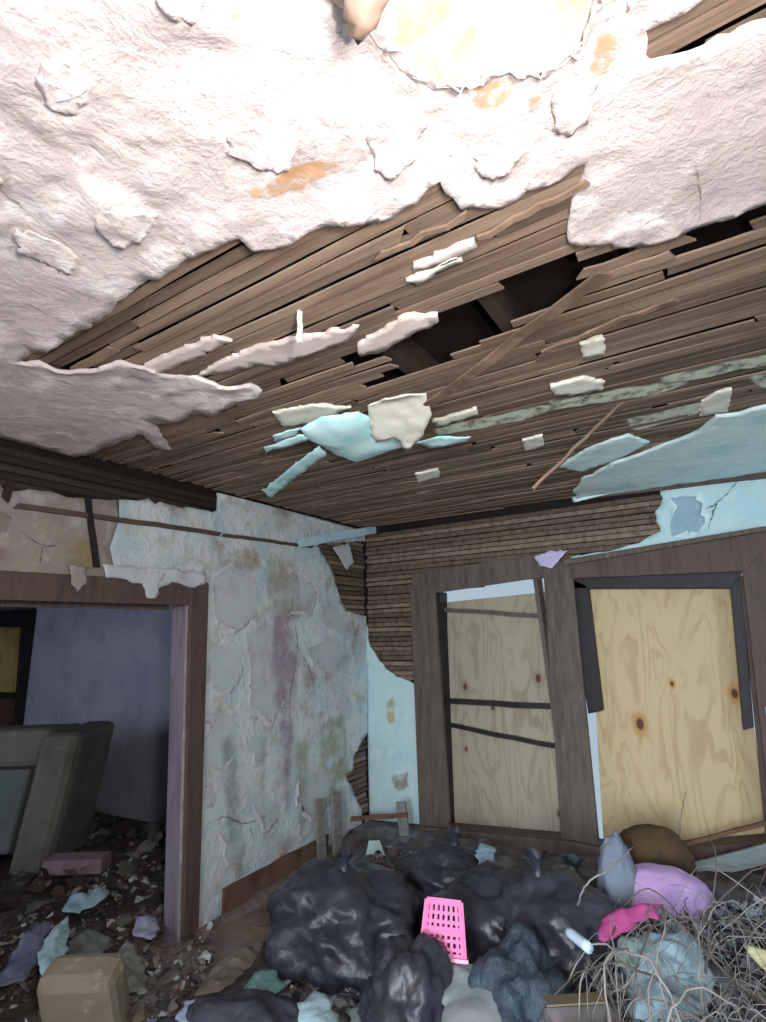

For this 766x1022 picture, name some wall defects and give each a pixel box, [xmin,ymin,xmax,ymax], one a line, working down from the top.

peeling [157,0,205,26]
peeling [370,0,641,94]
flaking render [646,0,766,59]
peeling [35,57,97,116]
peeling [551,80,600,137]
peeling [227,124,302,175]
peeling [365,113,429,181]
peeling [473,131,527,182]
flaking render [0,165,766,680]
peeling [294,769,336,823]
flaking render [345,735,368,814]